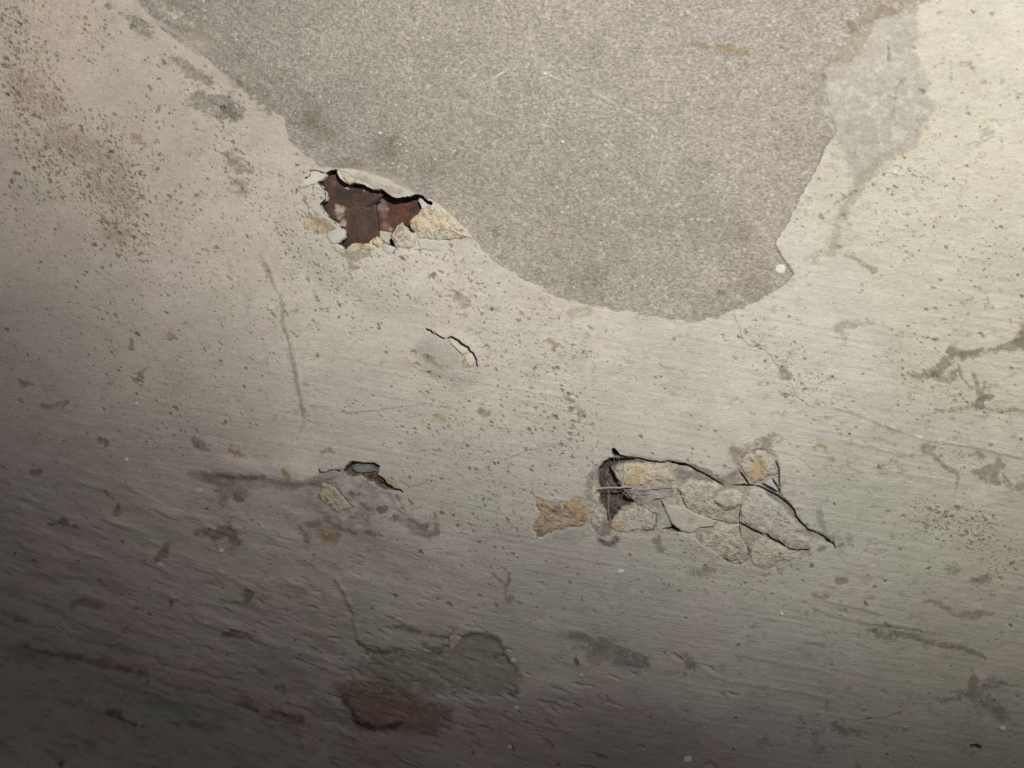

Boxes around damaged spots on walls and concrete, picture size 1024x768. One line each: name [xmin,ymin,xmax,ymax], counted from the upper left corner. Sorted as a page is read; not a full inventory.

peeling [128,0,911,323]
spalling [188,462,440,538]
spalling [532,434,844,578]